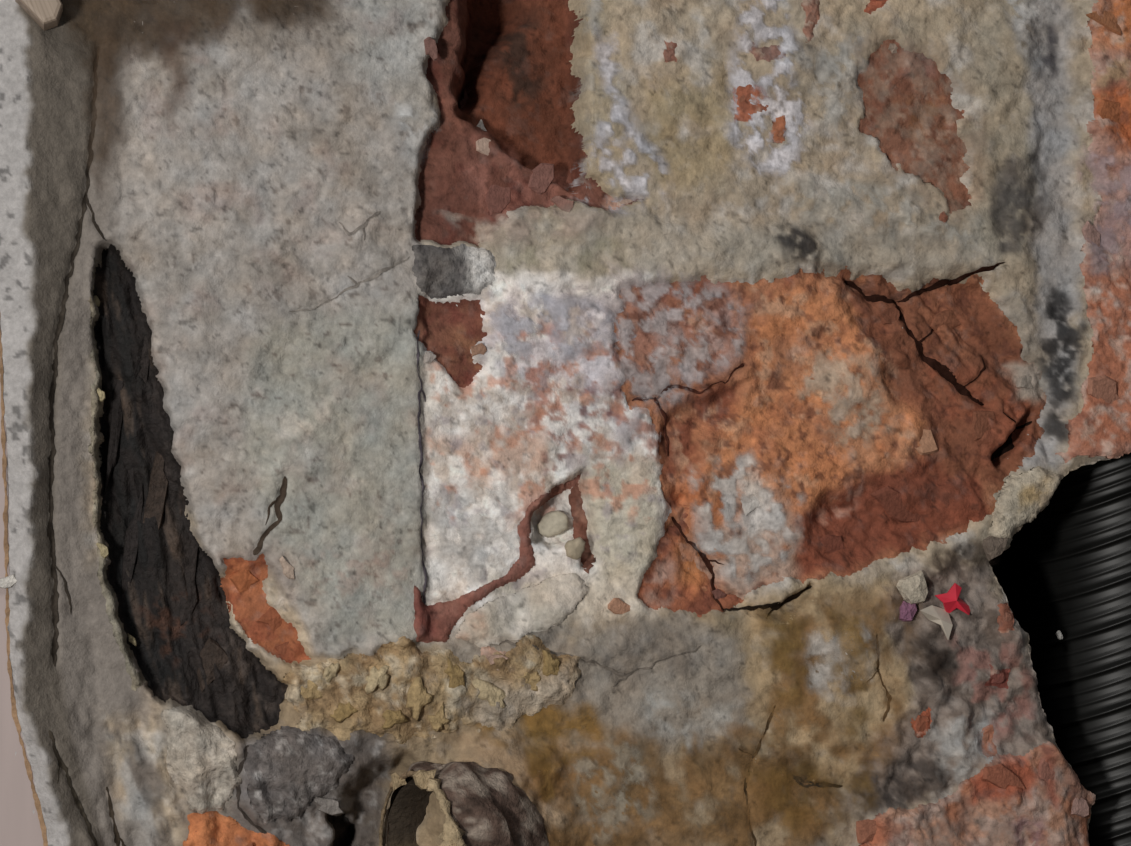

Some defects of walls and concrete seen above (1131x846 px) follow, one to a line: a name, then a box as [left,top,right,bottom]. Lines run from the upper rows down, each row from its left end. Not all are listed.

flaking render [414,0,644,246]
damp [595,43,666,212]
damp [729,0,803,174]
crack [632,363,744,456]
spalling [608,266,1047,617]
crack [844,262,1032,460]
flaking render [413,474,596,671]
crack [671,517,812,619]
damp [809,633,855,689]
crack [49,730,125,846]
damp [576,743,649,839]
spalling [856,724,1096,846]